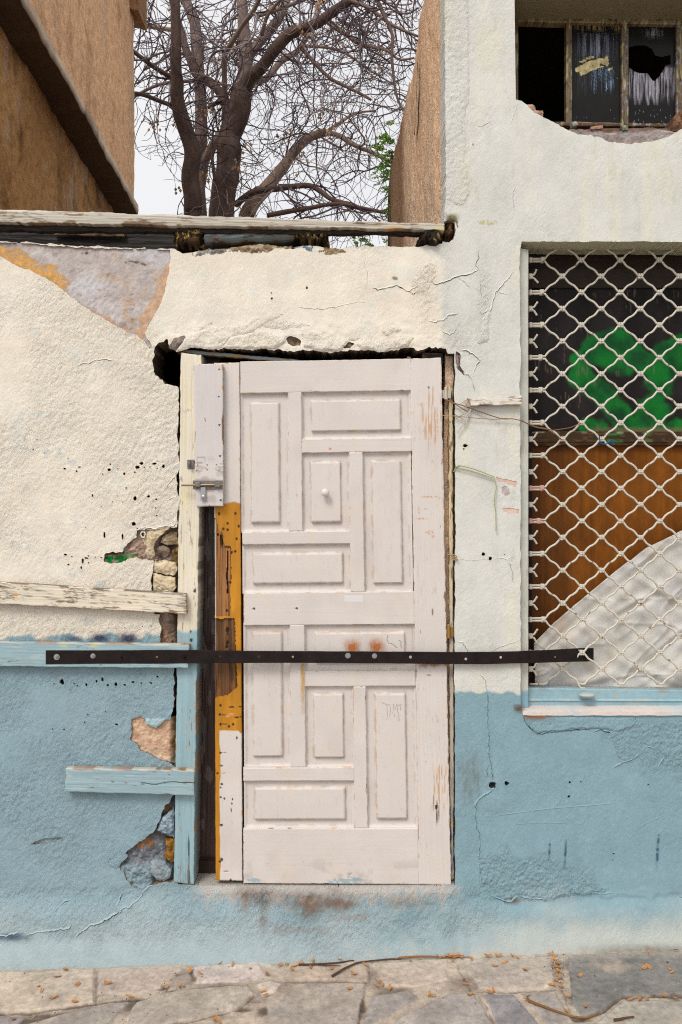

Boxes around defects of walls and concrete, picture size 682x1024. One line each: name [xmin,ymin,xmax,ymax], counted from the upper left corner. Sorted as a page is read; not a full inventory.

flaking render [569,127,681,144]
peeling [0,242,171,349]
crack [299,251,514,392]
flaking render [105,527,179,592]
flaking render [121,709,176,763]
crack [474,674,546,903]
flaking render [109,795,175,889]
crack [0,885,153,939]